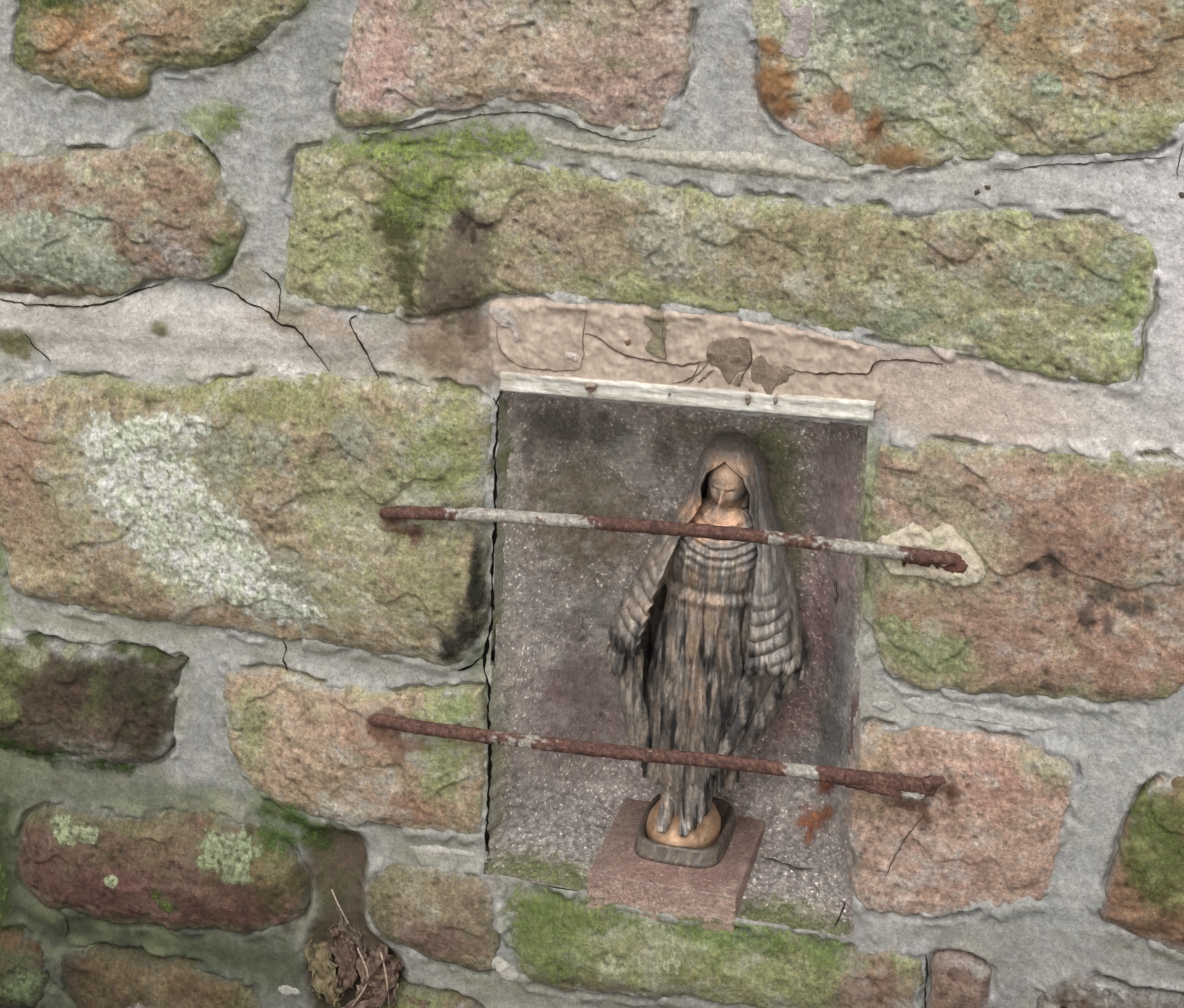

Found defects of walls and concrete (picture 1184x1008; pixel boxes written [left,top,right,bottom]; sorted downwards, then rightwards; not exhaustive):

crack [996,144,1184,179]
crack [0,284,161,361]
crack [208,270,330,372]
damp [371,208,494,370]
peeling [585,382,597,399]
crack [496,310,709,384]
spalling [698,337,795,406]
crack [792,359,943,375]
damp [441,542,486,661]
crack [458,391,503,861]
corrosion [798,781,834,843]
corrosion [946,785,957,804]